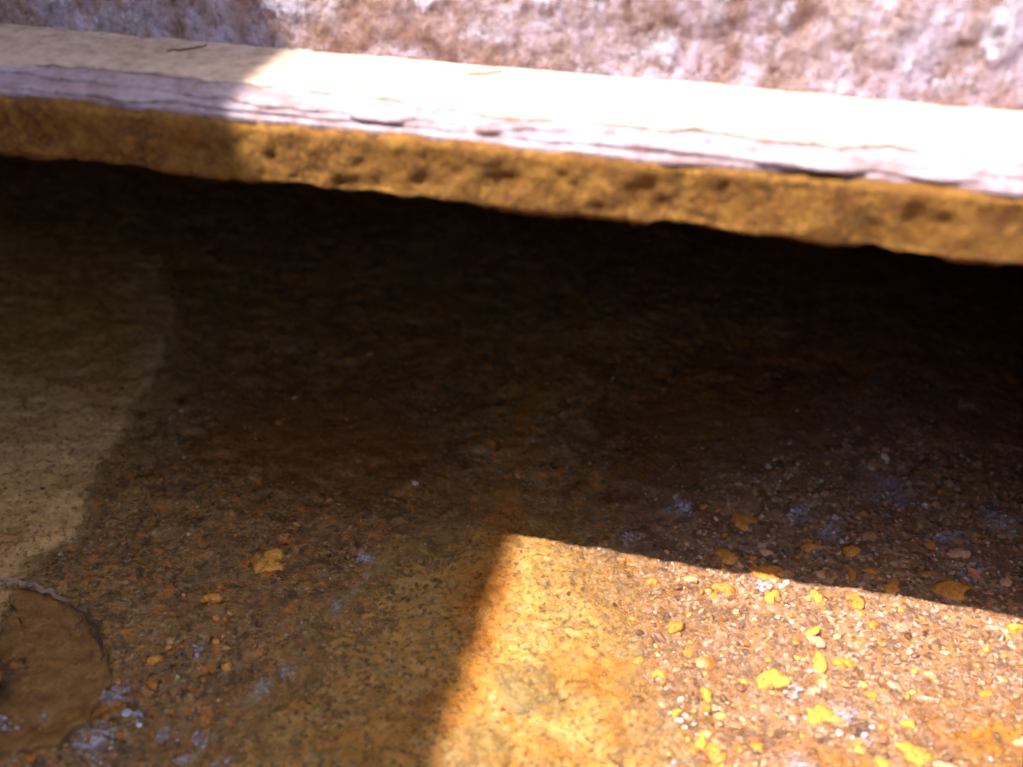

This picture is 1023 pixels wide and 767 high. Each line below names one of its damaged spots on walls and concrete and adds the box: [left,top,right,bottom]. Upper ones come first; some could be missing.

water stain [833,700,875,745]